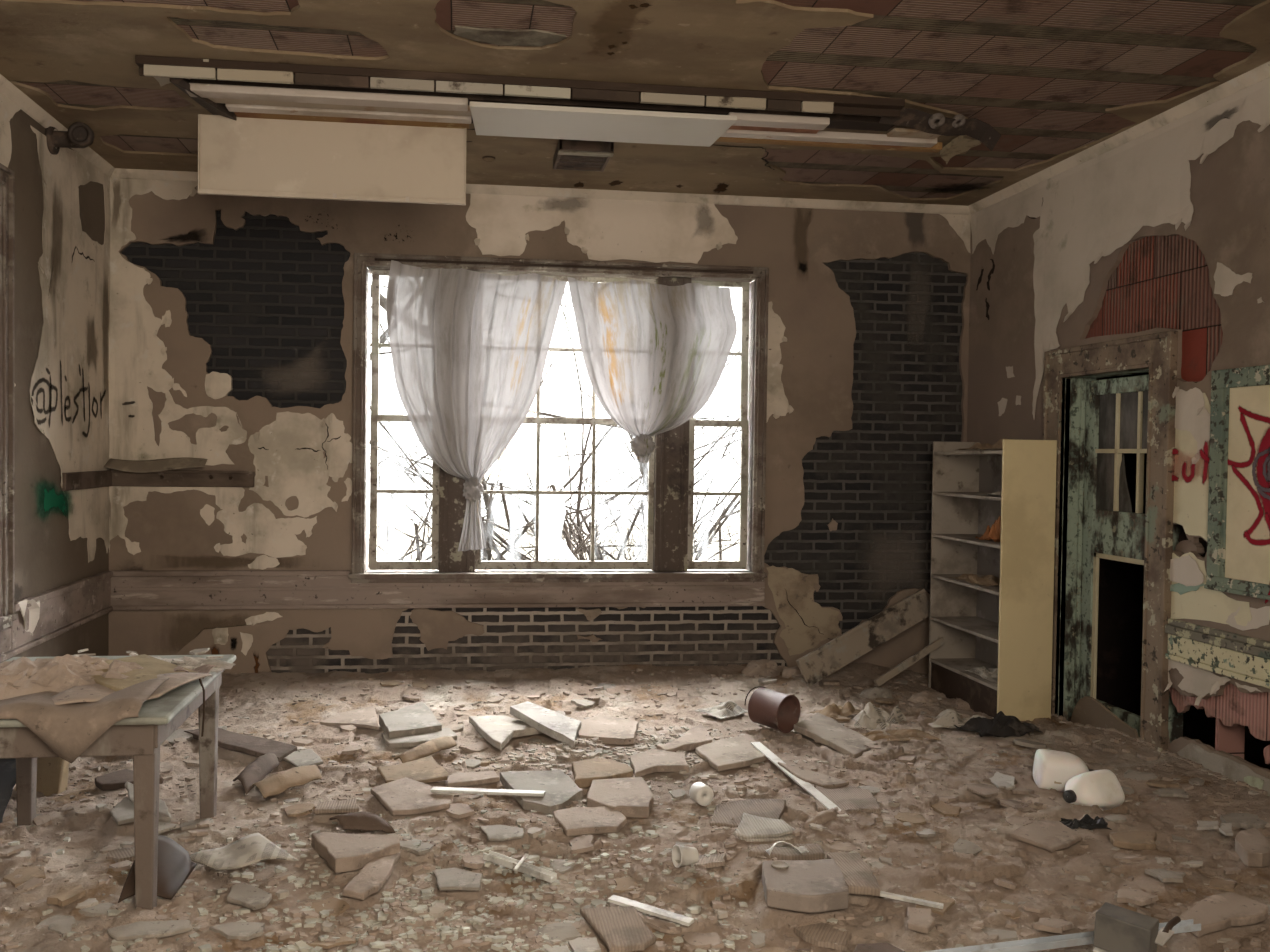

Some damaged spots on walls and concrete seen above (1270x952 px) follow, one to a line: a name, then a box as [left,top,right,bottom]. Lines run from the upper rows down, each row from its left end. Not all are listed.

flaking render [435,0,576,47]
flaking render [15,125,353,570]
peeling [212,612,282,656]
flaking render [266,252,967,674]
flaking render [762,0,1270,631]
spalling [1164,659,1270,797]